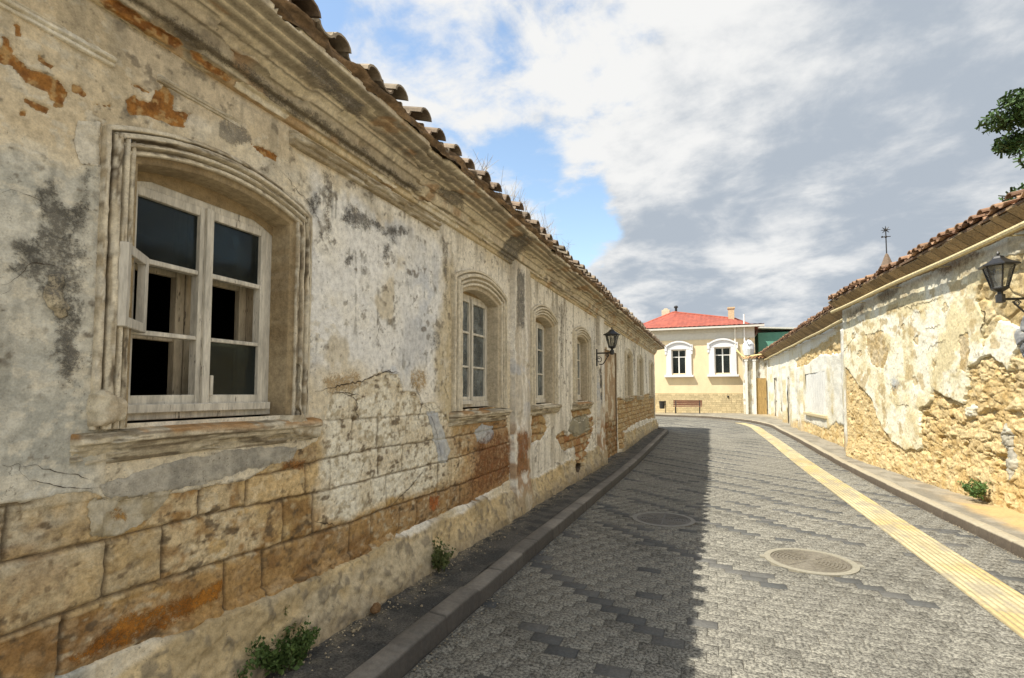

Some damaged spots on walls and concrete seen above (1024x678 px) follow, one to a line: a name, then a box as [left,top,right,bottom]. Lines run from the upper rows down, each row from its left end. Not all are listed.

peeling [0,24,86,116]
peeling [125,84,191,128]
peeling [251,144,277,162]
leakage [308,172,406,260]
leakage [7,181,89,380]
crack [4,463,90,489]
crack [323,316,396,420]
flaking render [531,409,594,472]
flaking render [617,393,654,449]
flaking render [796,253,1024,514]
flaking render [0,372,509,678]